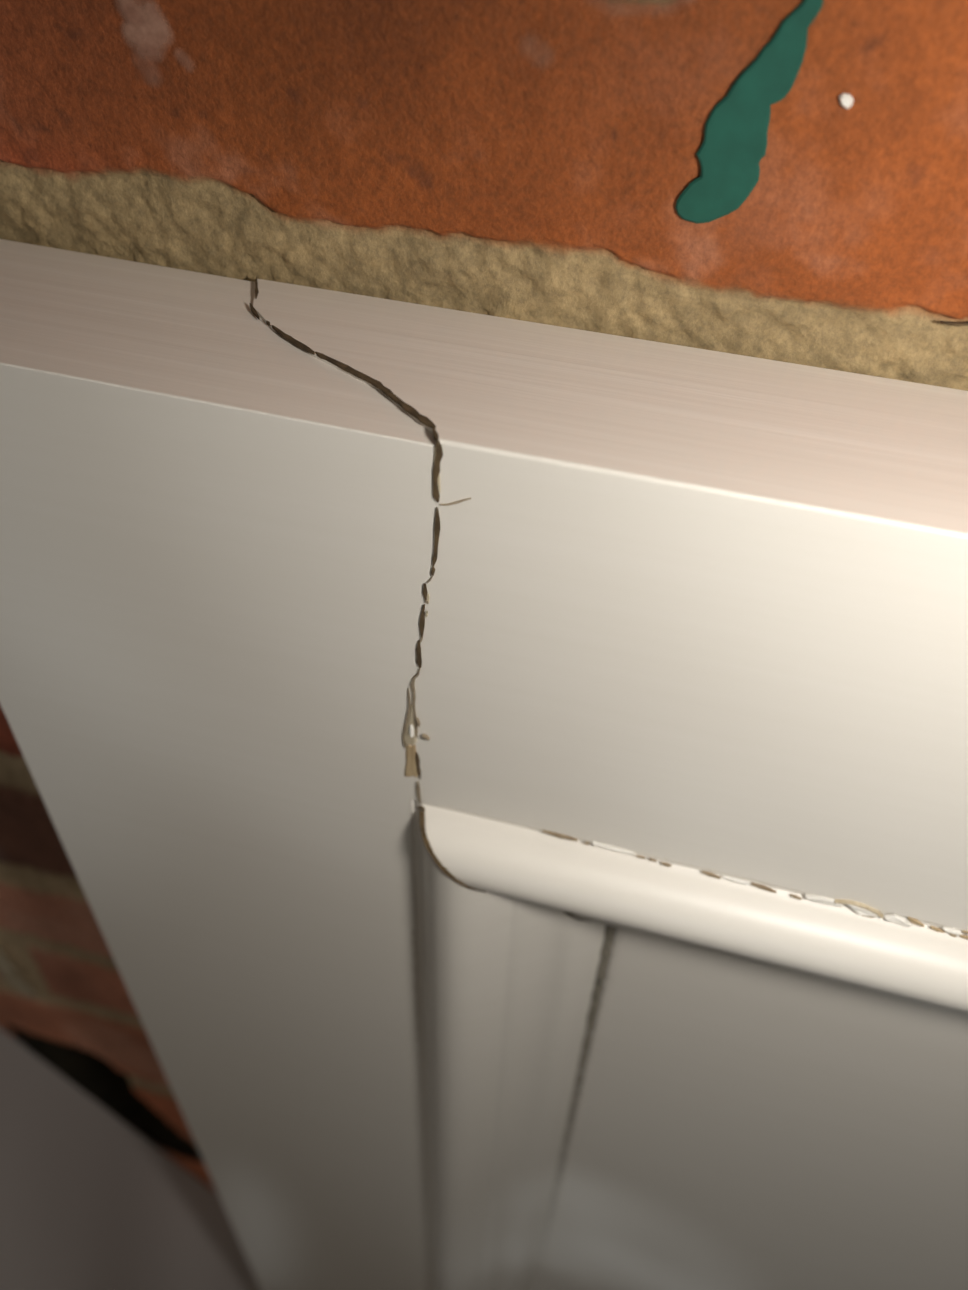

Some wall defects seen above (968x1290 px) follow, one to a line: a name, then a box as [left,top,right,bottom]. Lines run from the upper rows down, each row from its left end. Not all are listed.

leakage [118,0,169,58]
crack [940,320,968,328]
crack [249,276,486,892]
peeling [543,830,671,867]
peeling [702,870,968,940]
spalling [7,1024,203,1161]